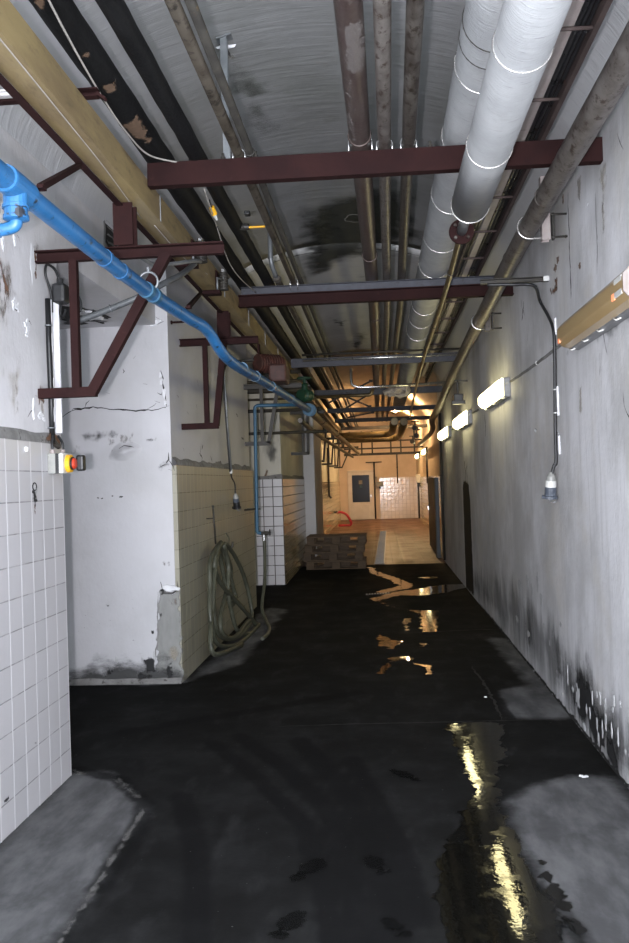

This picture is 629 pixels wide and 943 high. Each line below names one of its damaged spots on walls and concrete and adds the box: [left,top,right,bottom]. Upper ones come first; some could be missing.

crack [63,400,167,417]
spalling [154,582,184,678]
water stain [70,651,184,683]